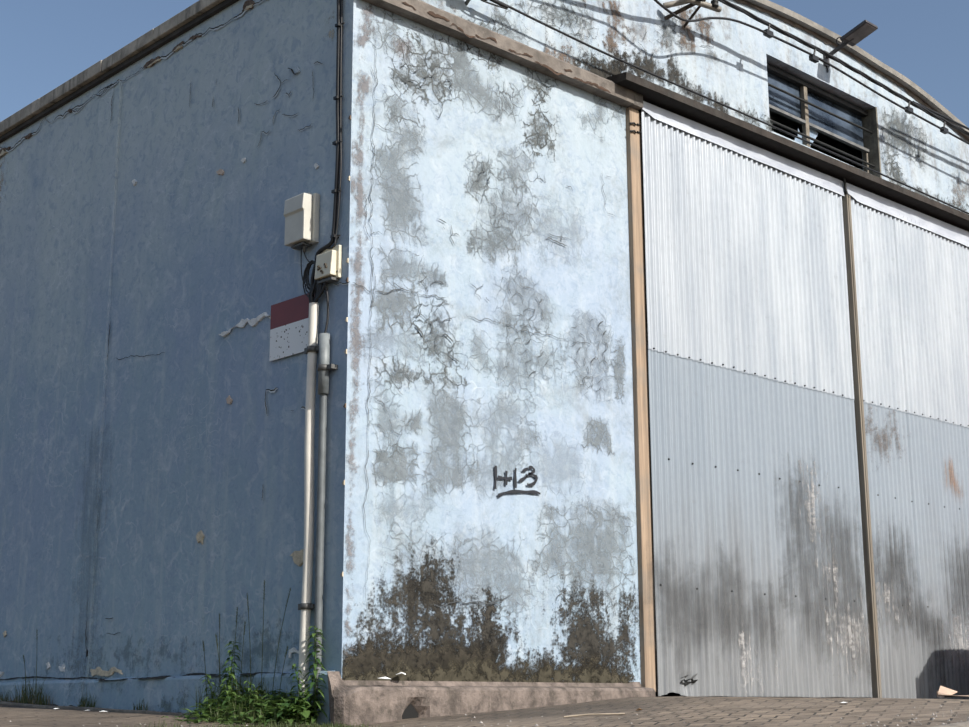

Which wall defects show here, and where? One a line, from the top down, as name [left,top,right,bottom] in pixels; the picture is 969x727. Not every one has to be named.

crack [403,0,611,93]
mould [518,0,772,131]
damp [879,110,969,211]
damp [368,13,557,493]
peeling [219,312,271,337]
crack [334,15,608,633]
damp [613,345,626,399]
damp [342,504,641,683]
peeling [90,667,123,677]